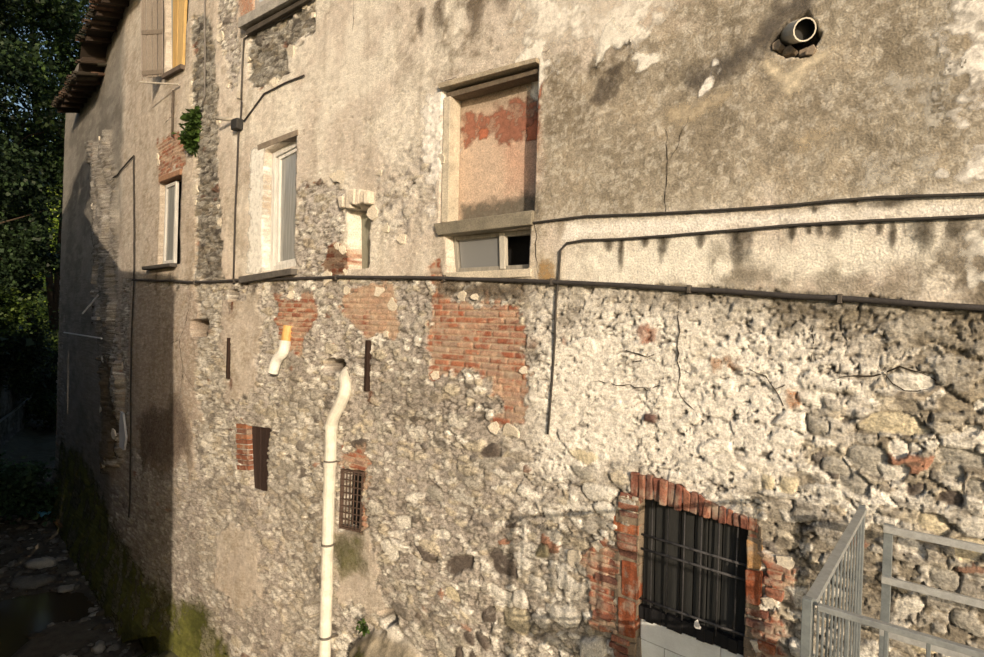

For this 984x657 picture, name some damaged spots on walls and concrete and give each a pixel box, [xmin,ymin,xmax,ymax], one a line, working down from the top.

spalling [208,0,281,101]
spalling [286,32,312,62]
peeling [461,0,673,149]
damp [668,0,829,122]
crack [664,117,689,212]
spalling [274,170,398,356]
damp [606,240,623,264]
damp [642,237,668,253]
damp [789,224,841,238]
damp [877,222,896,245]
spalling [427,259,534,438]
crack [831,366,936,392]